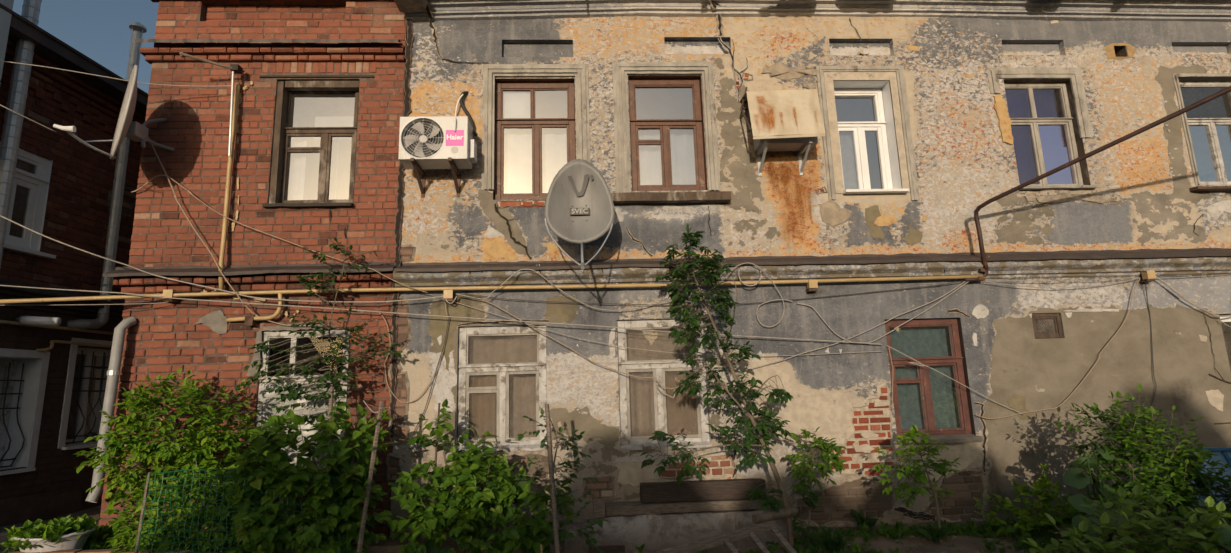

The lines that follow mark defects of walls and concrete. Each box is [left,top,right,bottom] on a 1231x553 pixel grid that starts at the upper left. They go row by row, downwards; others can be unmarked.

flaking render [399,244,416,263]
peeling [481,225,518,261]
peeling [547,242,560,258]
peeling [874,214,927,245]